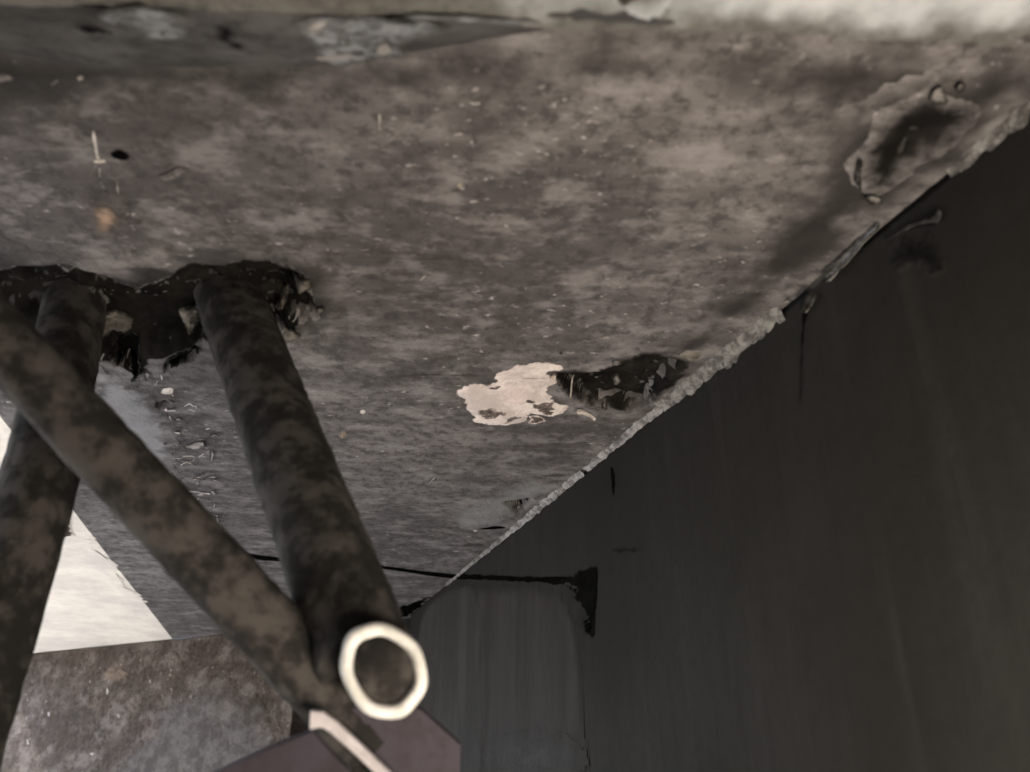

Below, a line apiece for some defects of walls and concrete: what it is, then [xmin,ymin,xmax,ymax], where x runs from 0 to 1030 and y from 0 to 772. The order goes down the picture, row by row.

spalling [0,241,325,528]
spalling [455,349,702,426]